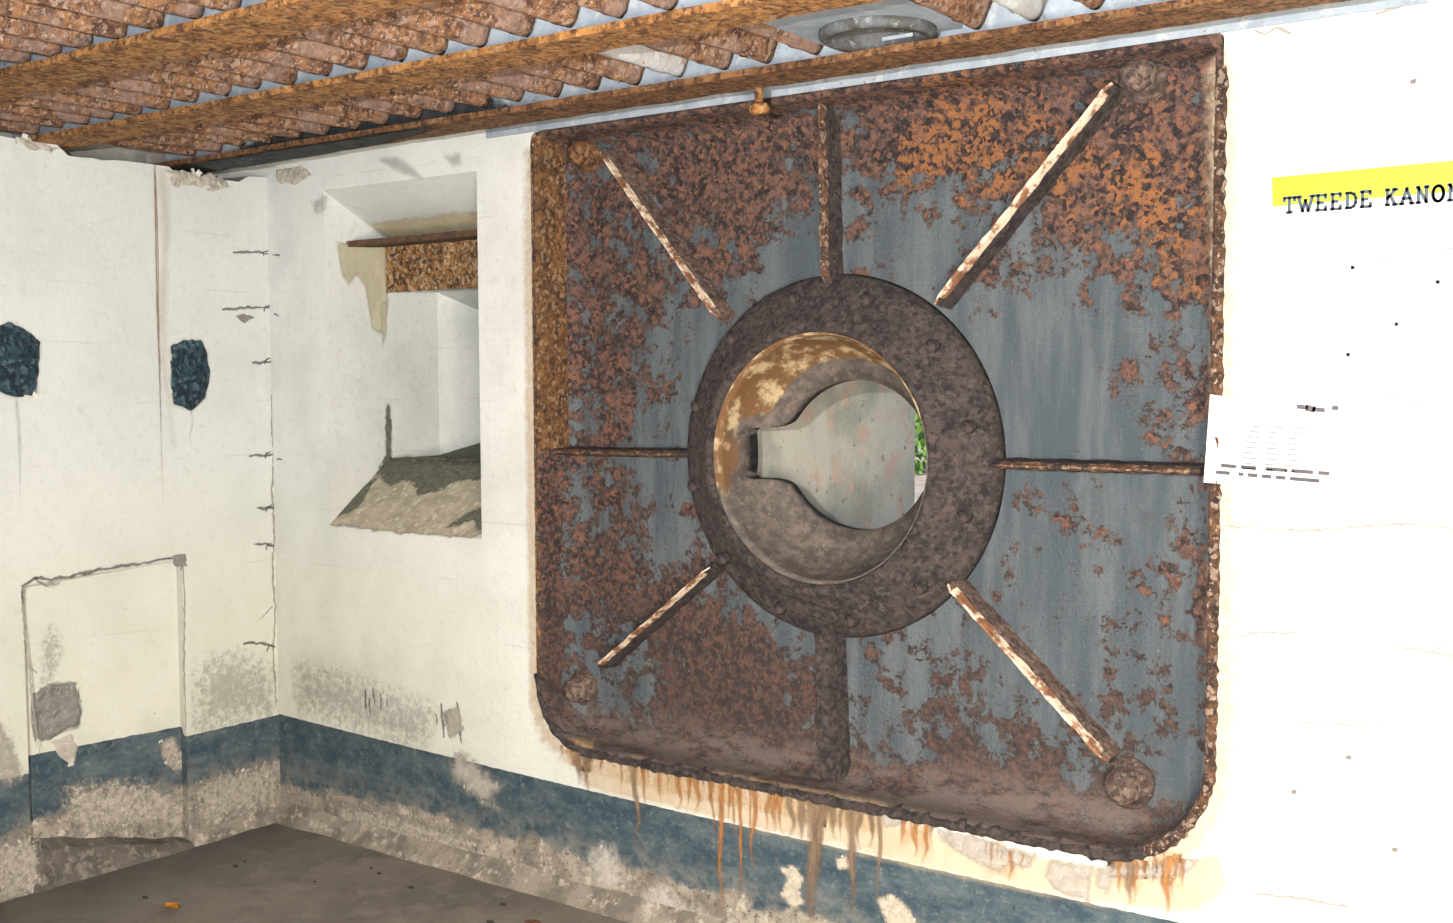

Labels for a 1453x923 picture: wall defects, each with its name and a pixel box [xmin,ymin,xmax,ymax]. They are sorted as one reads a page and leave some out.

peeling [0,322,40,399]
peeling [169,339,210,411]
crack [222,305,279,316]
crack [233,249,280,257]
corrosion [1223,120,1235,397]
crack [243,358,282,701]
corrosion [526,157,1055,908]
crack [21,557,187,755]
peeling [31,682,278,835]
corrosion [1087,484,1234,909]
peeling [780,865,805,909]
peeling [876,894,916,923]